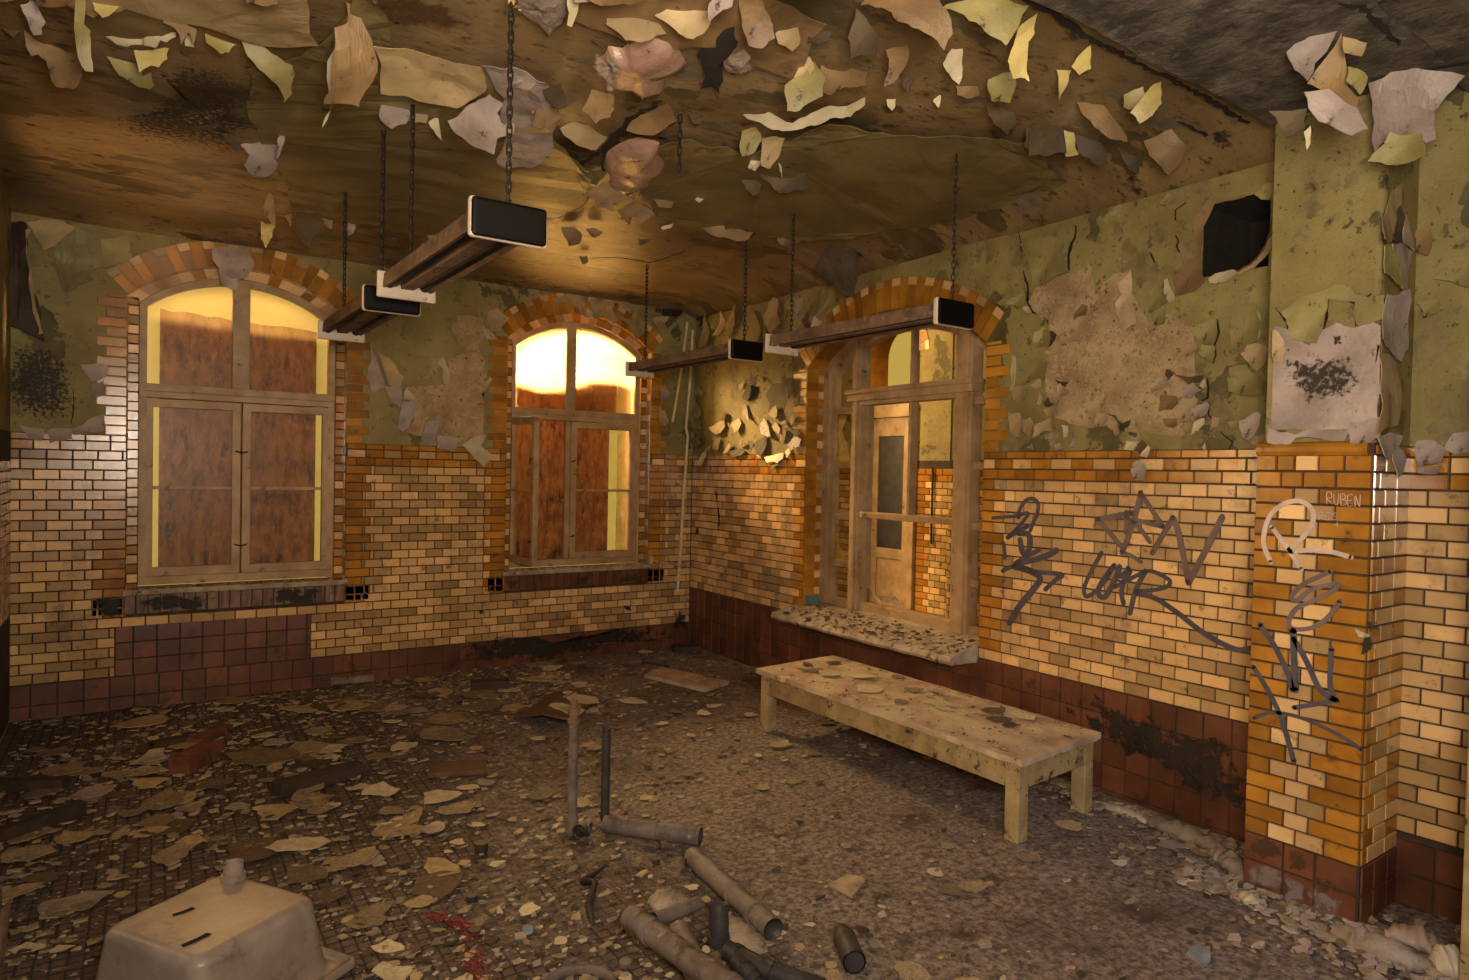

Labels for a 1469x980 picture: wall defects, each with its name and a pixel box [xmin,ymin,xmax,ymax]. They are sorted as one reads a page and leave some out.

mould [113,56,264,151]
peeling [1269,31,1465,165]
peeling [0,0,1187,349]
damp [10,344,76,428]
flaking render [366,308,510,467]
peeling [659,376,801,470]
peeling [997,182,1469,480]
mould [1287,336,1358,403]
damp [1066,695,1247,808]